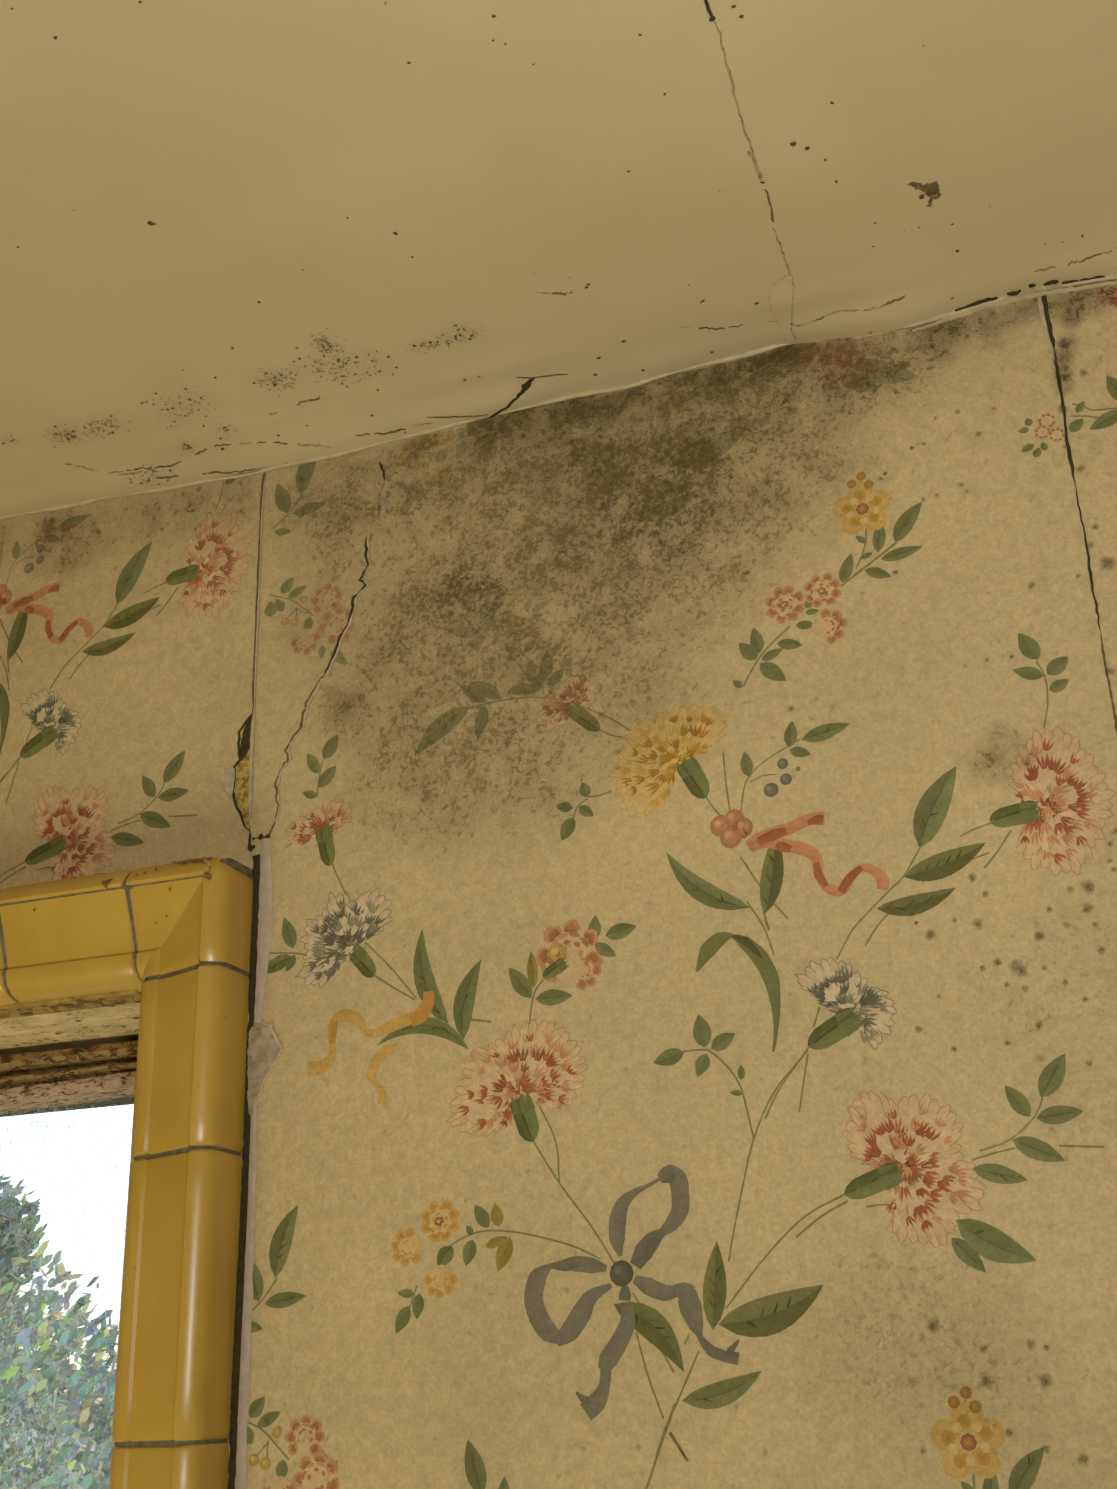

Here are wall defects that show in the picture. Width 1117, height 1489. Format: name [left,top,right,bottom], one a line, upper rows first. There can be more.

water stain [253,322,390,397]
crack [535,289,573,297]
crack [680,0,1117,344]
water stain [1033,284,1115,381]
crack [66,374,568,852]
water stain [296,309,1016,832]